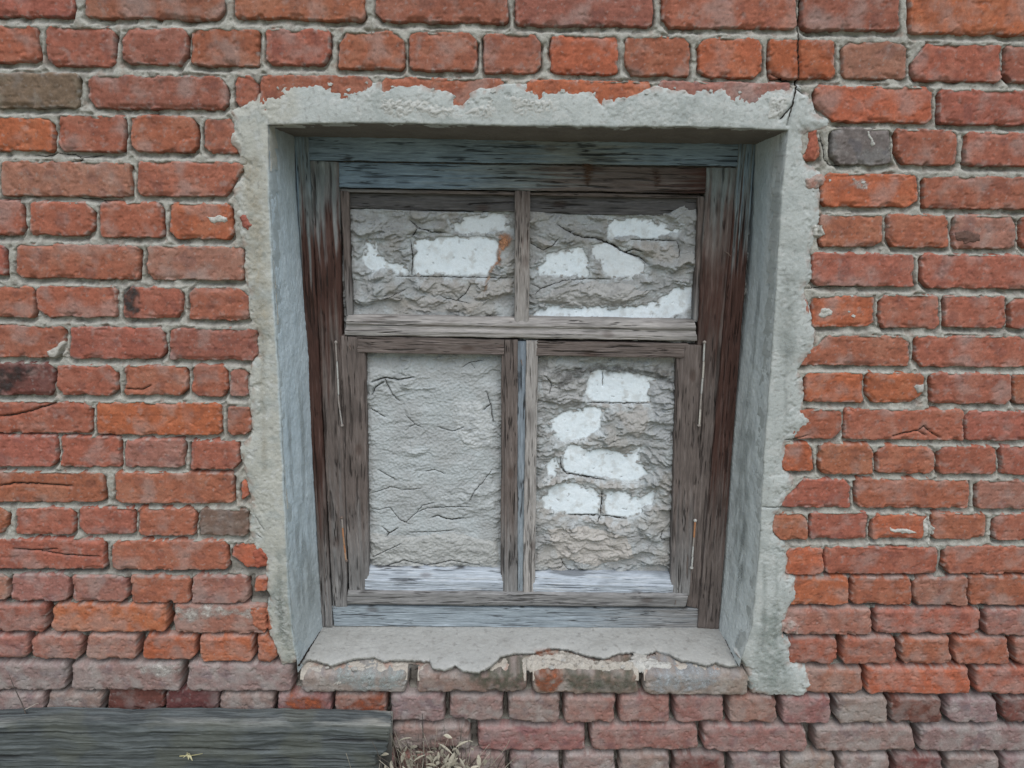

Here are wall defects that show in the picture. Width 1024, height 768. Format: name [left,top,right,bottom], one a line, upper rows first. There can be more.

peeling [260,75,504,110]
peeling [525,79,790,105]
crack [771,1,801,120]
spalling [361,211,511,277]
crack [386,222,499,303]
rust [484,234,510,291]
crack [533,225,680,262]
spalling [535,217,679,280]
spalling [530,285,692,318]
crack [373,377,463,431]
spalling [539,369,657,519]
crack [373,469,489,565]